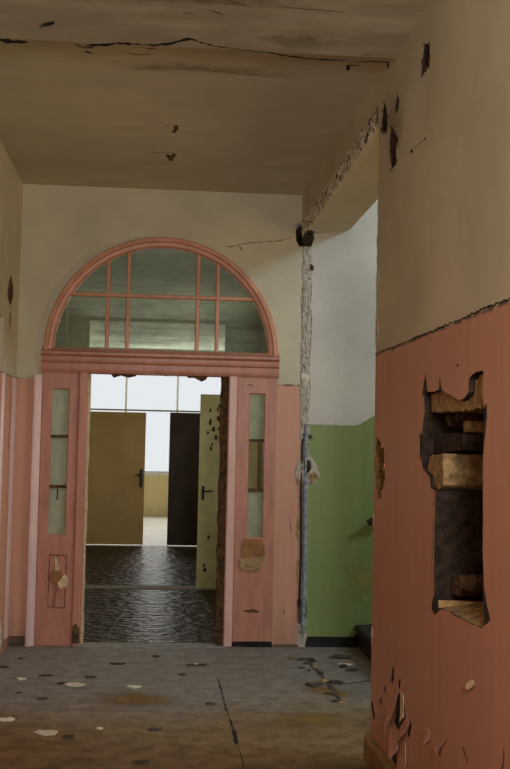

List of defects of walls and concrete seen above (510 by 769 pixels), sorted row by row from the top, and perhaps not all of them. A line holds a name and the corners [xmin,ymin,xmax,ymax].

crack [0,37,28,45]
crack [75,38,389,71]
flaking render [421,41,430,77]
crack [376,297,510,353]
flaking render [294,94,399,647]
spalling [420,374,487,490]
spalling [432,574,490,627]
crack [217,678,245,769]
peeling [371,668,411,769]